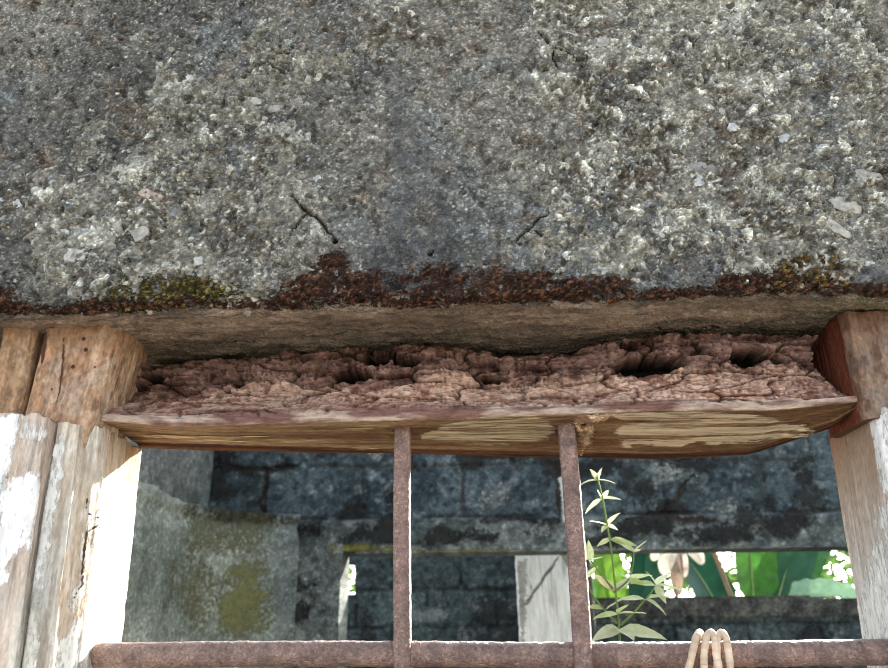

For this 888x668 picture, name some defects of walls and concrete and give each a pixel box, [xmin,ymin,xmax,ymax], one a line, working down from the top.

crack [293,198,336,242]
rust [0,248,888,316]
crack [516,215,547,243]
peeling [0,413,65,668]
crack [69,498,100,607]
peeling [49,475,128,668]
peeling [857,412,888,639]